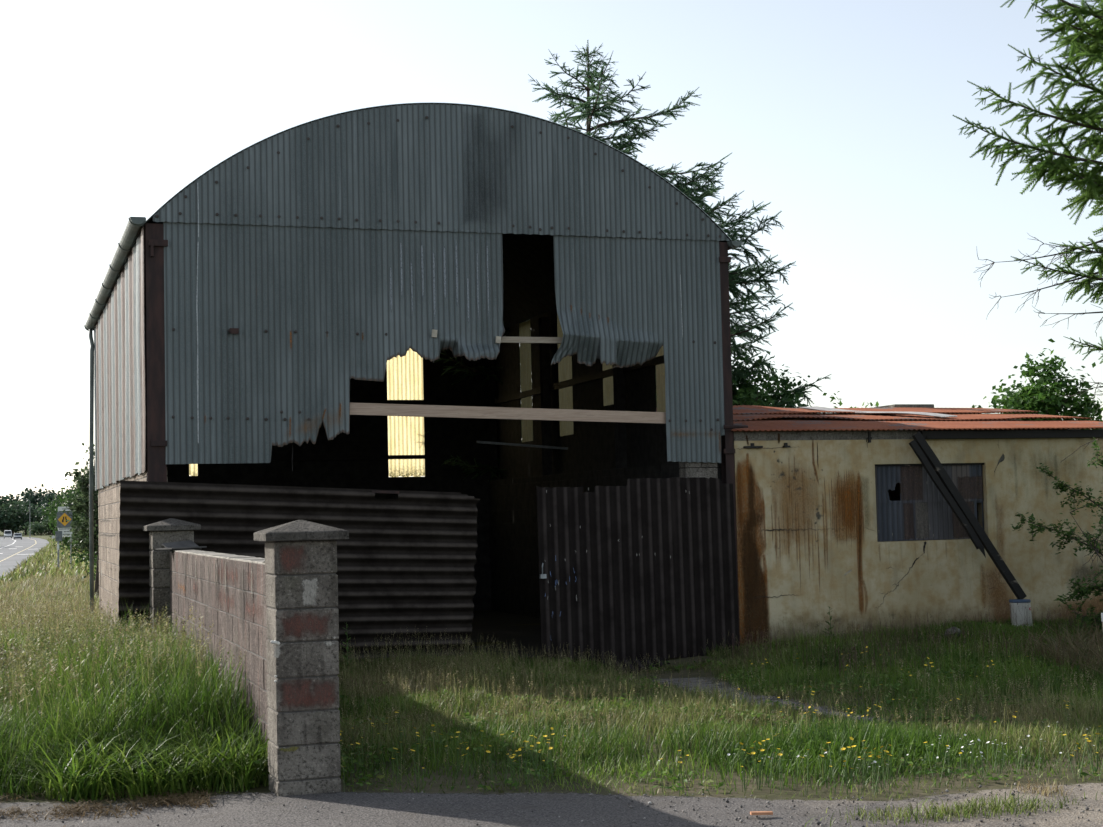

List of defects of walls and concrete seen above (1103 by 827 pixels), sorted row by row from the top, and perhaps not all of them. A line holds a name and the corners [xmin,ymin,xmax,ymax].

rust [736,436,769,647]
rust [812,442,868,613]
crack [878,541,927,607]